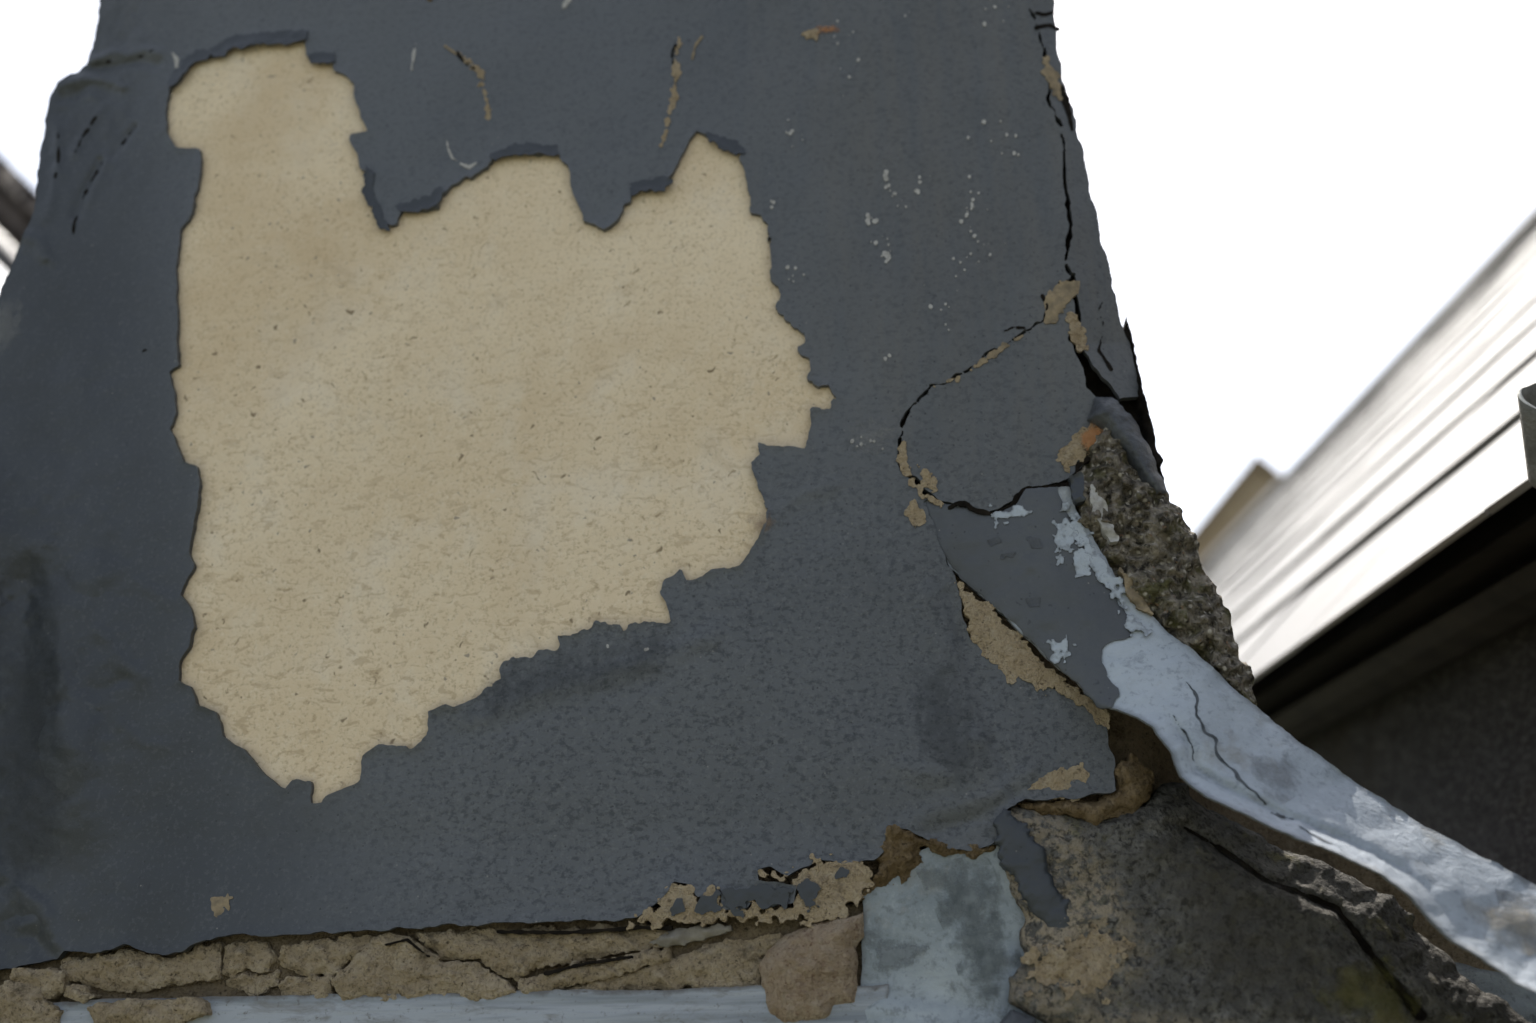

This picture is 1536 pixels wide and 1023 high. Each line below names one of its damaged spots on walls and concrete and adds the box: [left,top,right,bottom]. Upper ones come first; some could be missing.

crack [896,11,1113,516]
peeling [167,29,835,803]
peeling [989,504,1033,529]
peeling [1052,423,1153,637]
spalling [956,580,1110,731]
spalling [1028,762,1090,802]
spalling [210,893,233,917]
peeling [626,853,875,931]
spalling [1020,923,1136,1005]